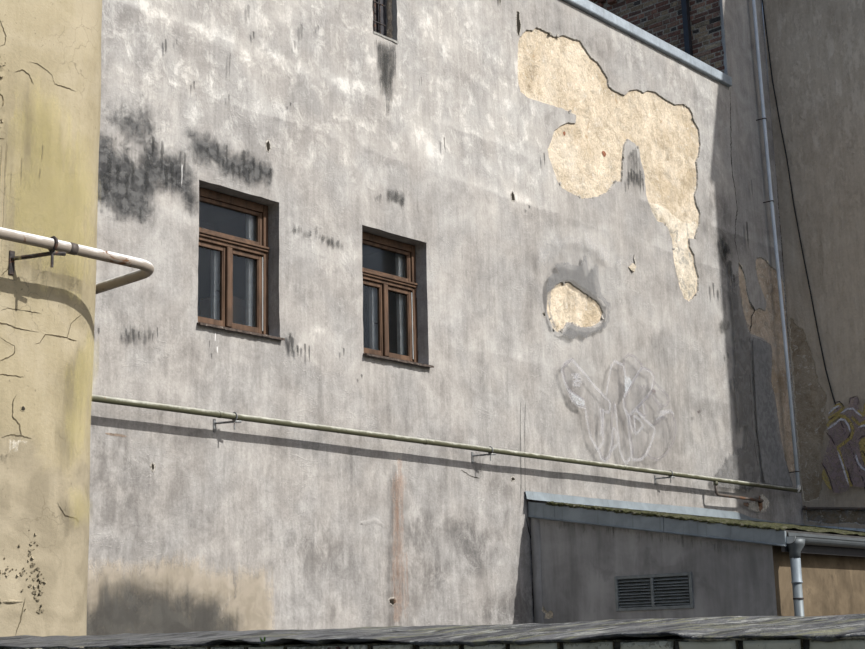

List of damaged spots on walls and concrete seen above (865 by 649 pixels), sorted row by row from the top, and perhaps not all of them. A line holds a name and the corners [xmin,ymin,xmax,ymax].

crack [16,62,77,92]
water stain [376,41,395,92]
water stain [115,114,152,137]
water stain [98,136,195,222]
water stain [190,133,272,184]
flaking render [516,10,701,302]
flaking render [542,281,604,333]
crack [0,308,82,438]
peeling [738,257,865,525]
peeling [0,530,47,613]
water stain [87,559,273,635]